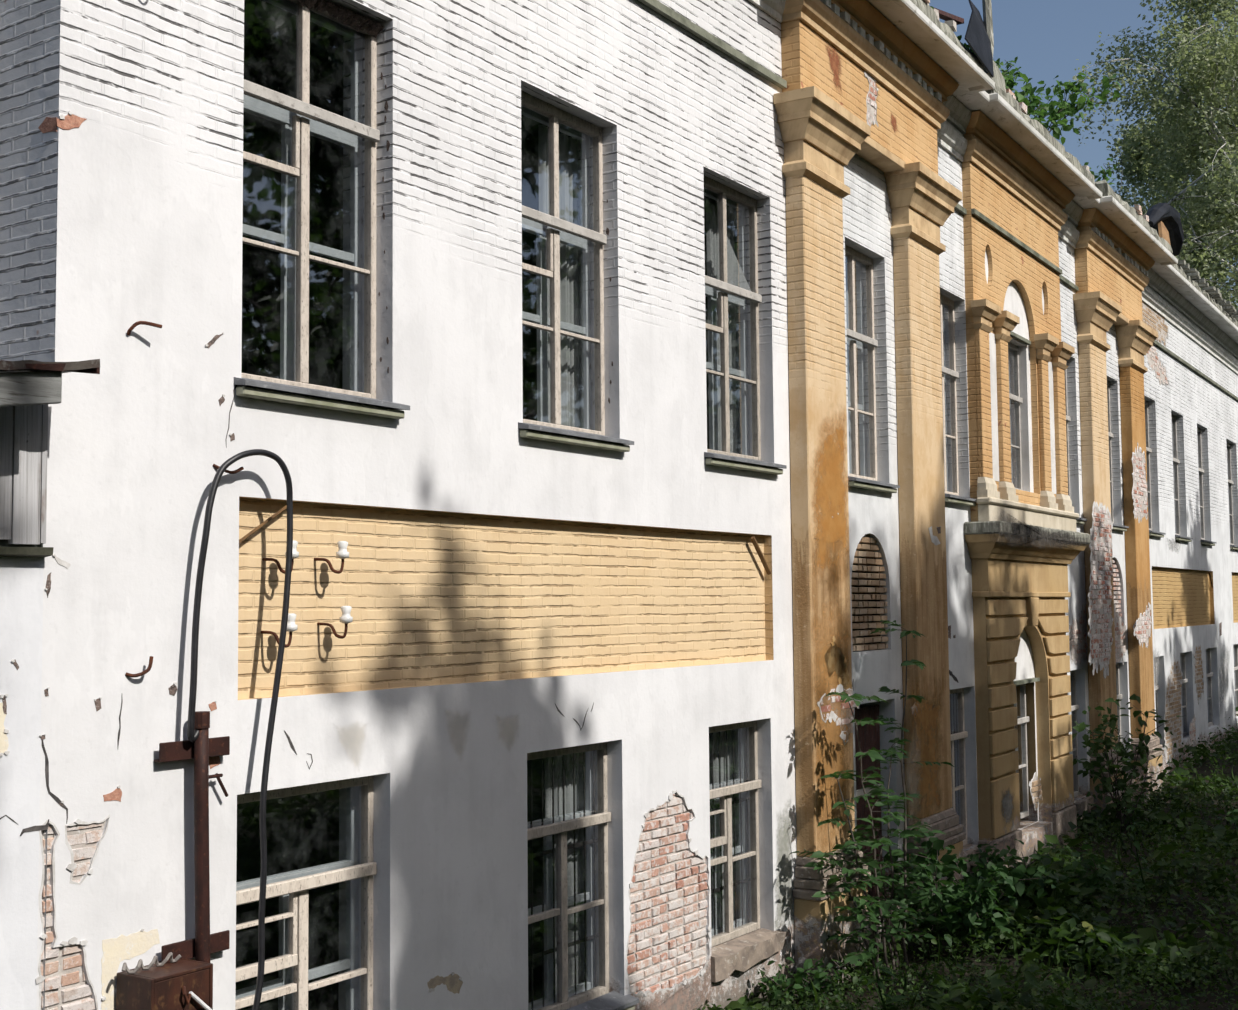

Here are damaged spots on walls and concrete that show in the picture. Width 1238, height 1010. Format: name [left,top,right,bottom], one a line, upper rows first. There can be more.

spalling [38,111,86,133]
water stain [814,419,848,580]
spalling [1132,442,1148,523]
spalling [1068,501,1152,678]
peeling [0,694,10,757]
water stain [815,613,850,827]
spalling [817,636,860,745]
spalling [1164,644,1204,763]
crack [0,740,68,836]
spalling [35,785,160,1010]
spalling [626,790,711,996]
water stain [635,981,705,1010]